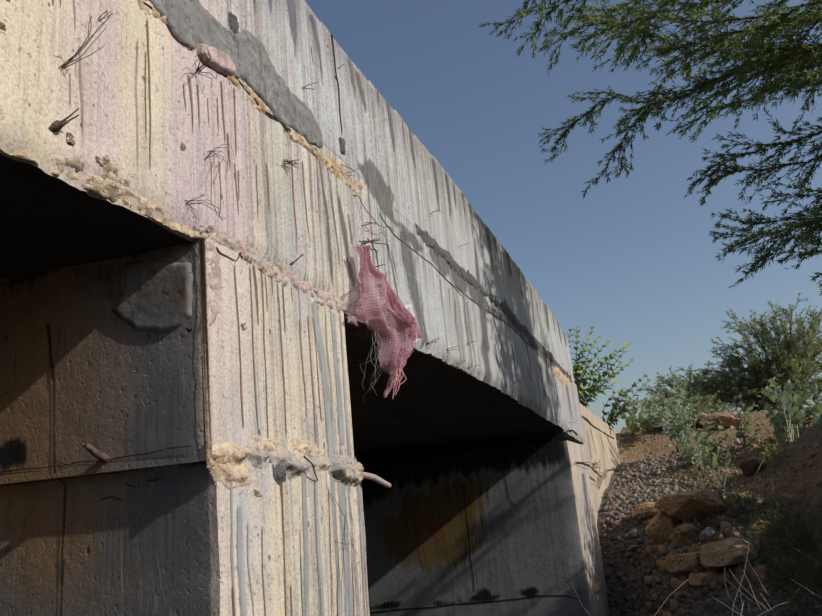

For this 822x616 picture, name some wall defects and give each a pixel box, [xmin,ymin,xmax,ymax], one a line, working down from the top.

leakage [288,0,297,50]
leakage [309,14,323,77]
leakage [136,20,151,170]
spalling [0,140,39,166]
leakage [207,81,239,214]
leakage [256,163,270,212]
spalling [288,130,364,195]
crack [379,213,526,342]
leakage [0,438,27,469]
crack [0,445,207,500]
crack [370,484,581,614]